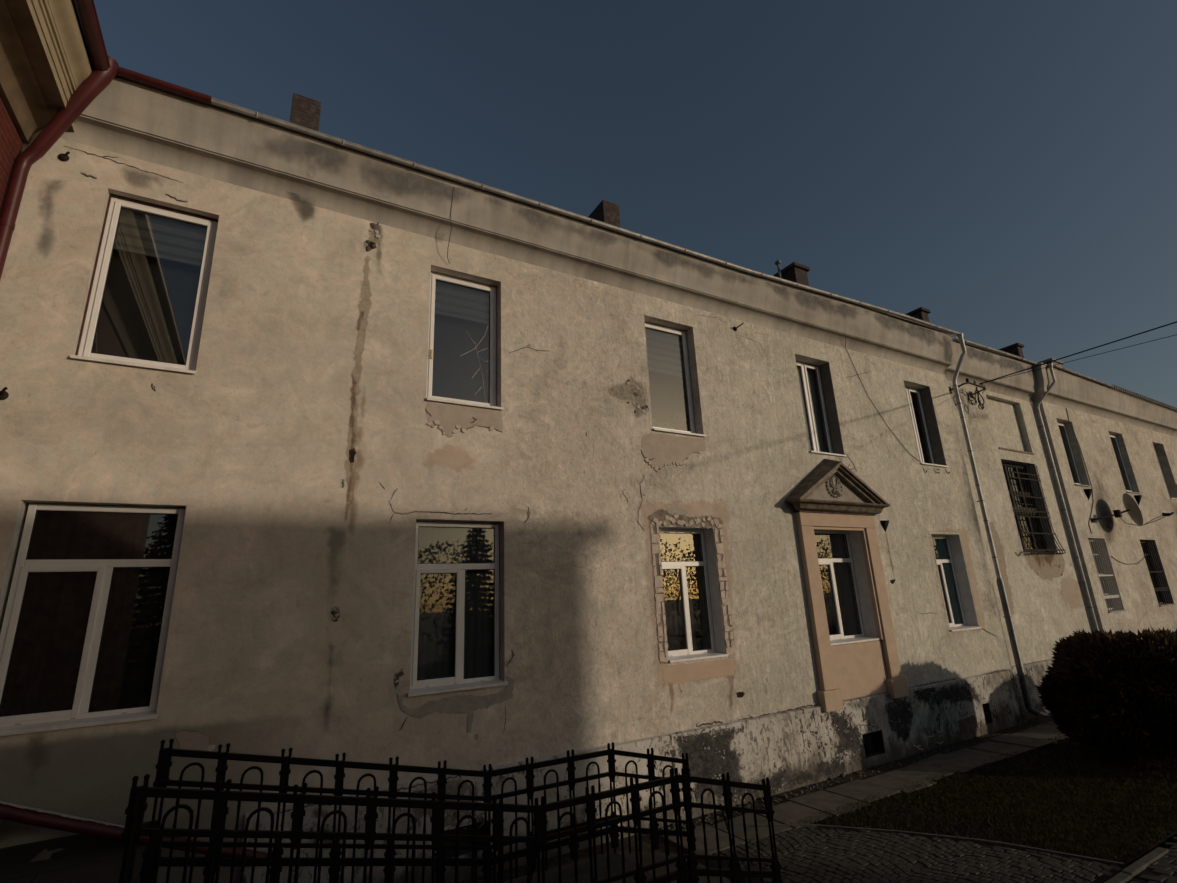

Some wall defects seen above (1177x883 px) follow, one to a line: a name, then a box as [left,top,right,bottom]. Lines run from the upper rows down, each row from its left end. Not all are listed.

crack [65,146,188,202]
spalling [608,377,650,417]
peeling [426,402,503,438]
crack [379,481,492,521]
leakage [883,680,979,747]